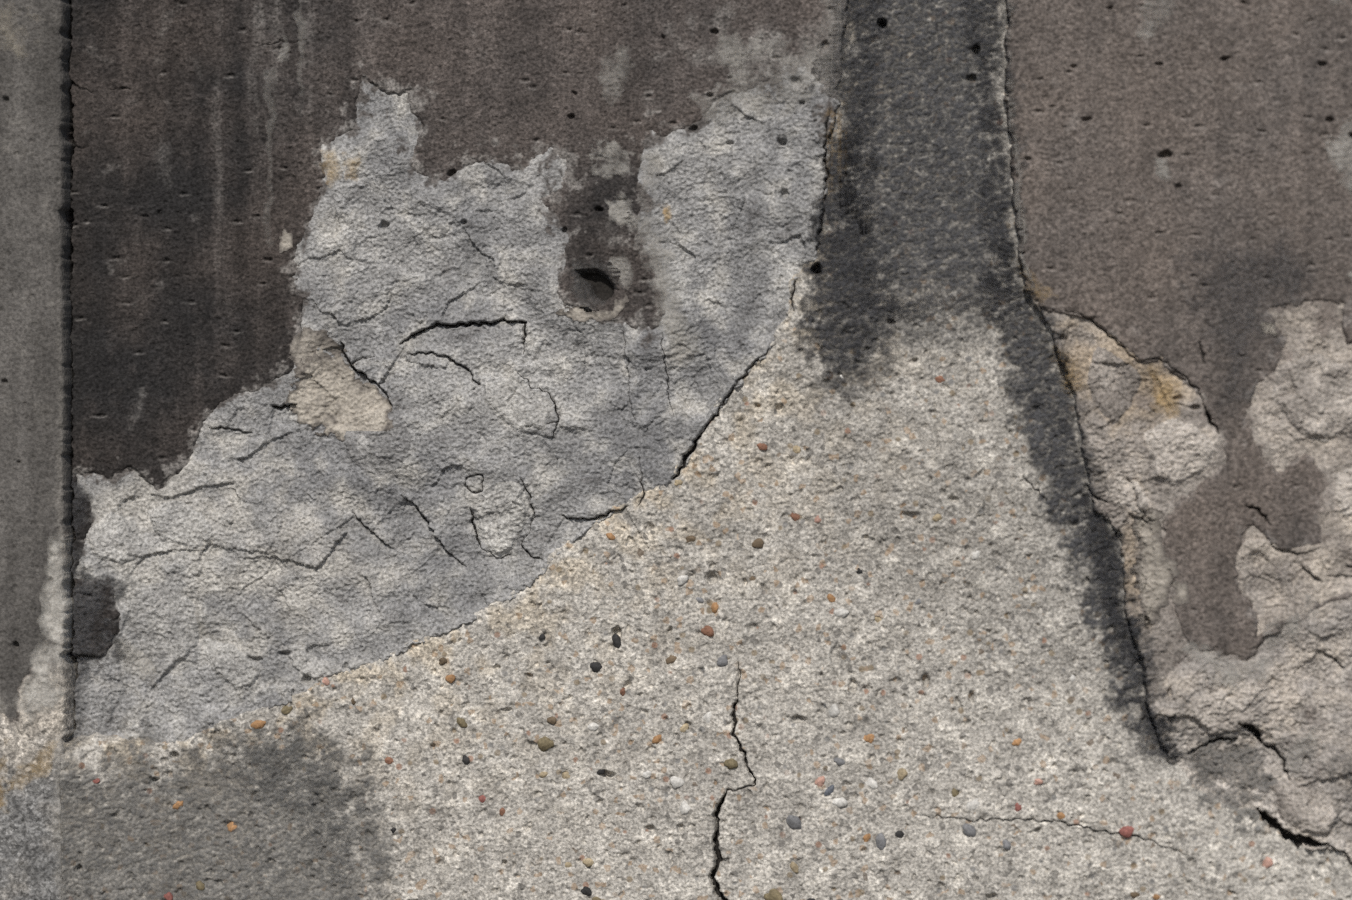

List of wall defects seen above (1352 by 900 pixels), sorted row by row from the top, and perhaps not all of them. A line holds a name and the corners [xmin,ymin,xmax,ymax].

spalling [0,65,841,900]
crack [340,319,560,437]
crack [401,338,776,567]
water stain [799,0,1180,758]
spalling [1026,291,1352,863]
crack [711,663,756,900]
crack [1187,724,1290,780]
crack [1257,808,1352,864]